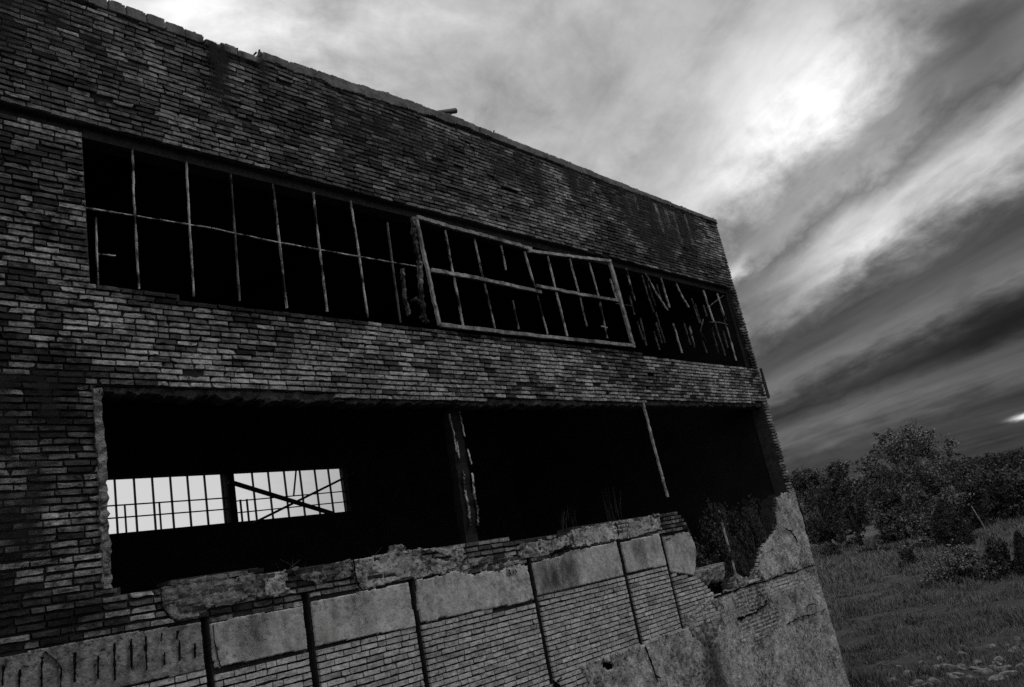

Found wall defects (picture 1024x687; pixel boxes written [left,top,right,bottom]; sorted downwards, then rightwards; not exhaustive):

peeling [159,513,662,620]
peeling [682,488,814,648]
crack [714,528,814,622]